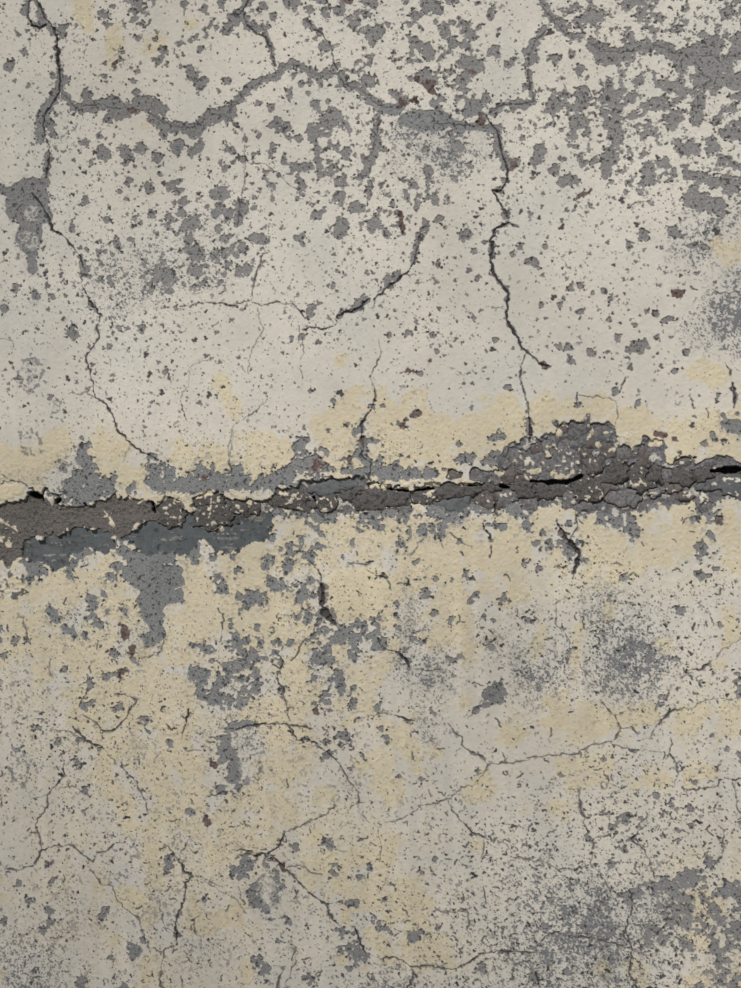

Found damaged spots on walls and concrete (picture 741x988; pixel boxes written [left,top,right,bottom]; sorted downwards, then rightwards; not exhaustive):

crack [27,0,427,462]
peeling [0,0,741,300]
spalling [0,402,741,798]
crack [409,474,584,559]
peeling [539,282,614,313]
crack [434,1,730,443]
peeling [587,311,678,358]
crack [710,466,741,475]
crack [0,693,247,988]
crack [234,512,741,988]
peeling [605,810,646,871]
peeling [609,856,741,988]